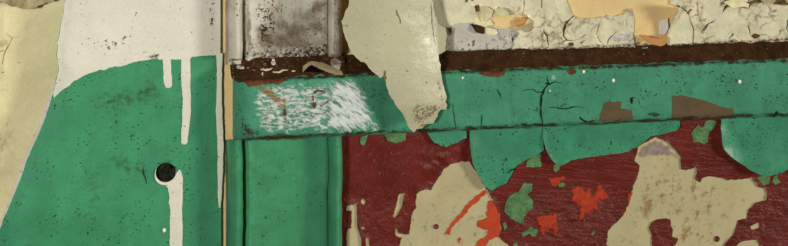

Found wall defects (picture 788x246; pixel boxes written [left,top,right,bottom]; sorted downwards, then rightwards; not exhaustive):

crack [543,16,612,45]
peeling [567,0,693,46]
peeling [0,0,224,246]
crack [523,76,588,124]
peeling [599,101,633,122]
peeling [672,95,734,121]
peeling [346,199,369,246]
peeling [393,193,404,218]
peeling [395,161,509,246]
peeling [536,213,558,236]
peeling [606,137,767,246]